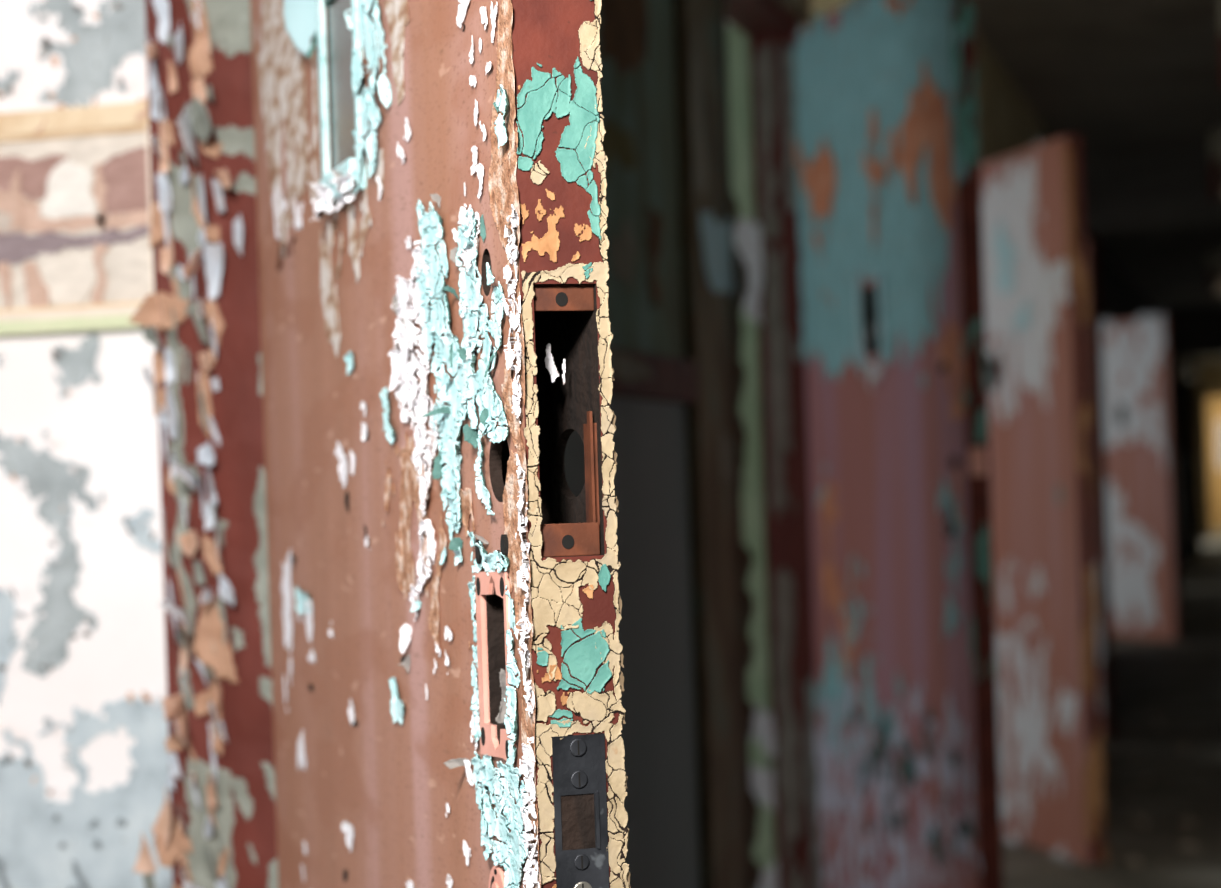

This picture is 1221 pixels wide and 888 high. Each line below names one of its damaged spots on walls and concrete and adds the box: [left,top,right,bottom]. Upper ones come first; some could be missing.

peeling [0,0,411,888]
peeling [360,0,652,888]
peeling [690,21,763,488]
peeling [739,540,756,670]
peeling [744,697,778,888]
peeling [804,669,823,888]
peeling [781,0,979,390]
peeling [962,139,1069,447]
peeling [969,521,1077,846]
peeling [1106,478,1160,633]
peeling [1101,311,1166,470]